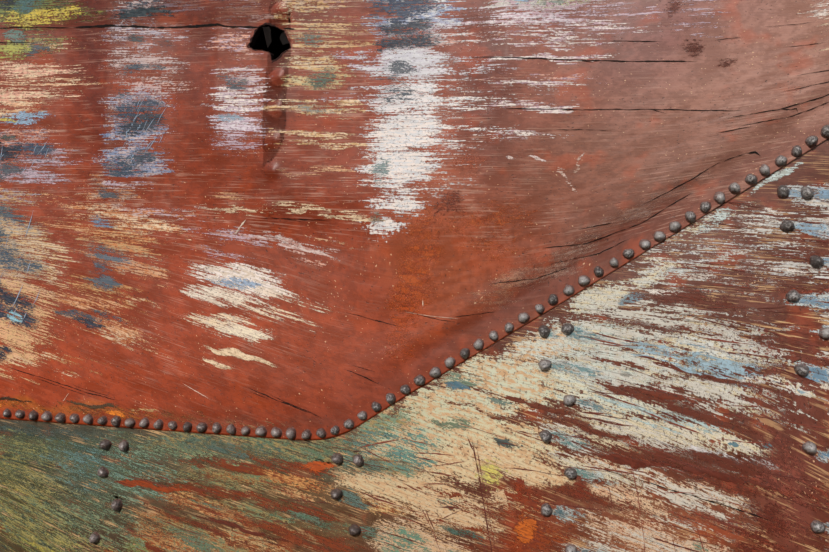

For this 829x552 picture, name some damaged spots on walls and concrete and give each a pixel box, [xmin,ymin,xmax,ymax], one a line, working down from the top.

peeling [0,0,665,385]
peeling [0,162,829,552]
peeling [674,0,730,38]
peeling [797,1,829,26]